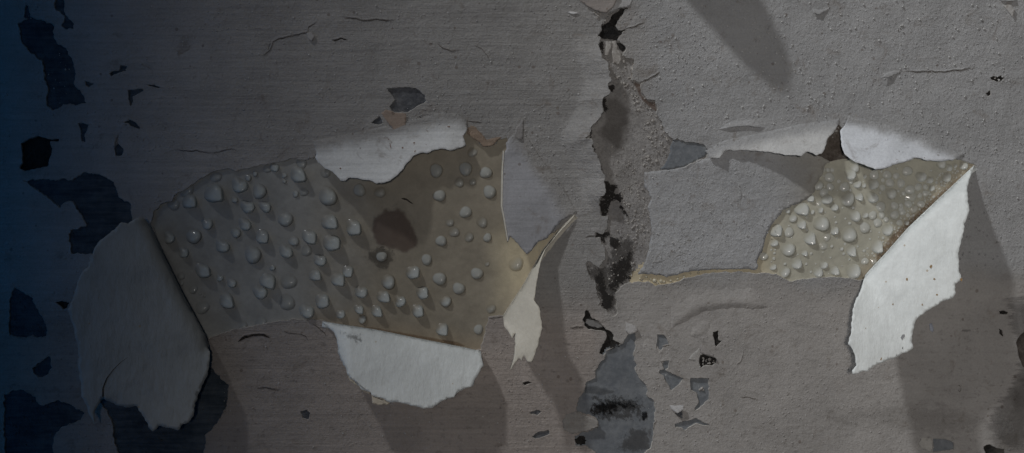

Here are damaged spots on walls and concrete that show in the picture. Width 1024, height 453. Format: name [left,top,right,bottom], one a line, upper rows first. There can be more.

peeling [18,0,94,110]
peeling [3,136,229,453]
peeling [313,87,467,184]
peeling [322,322,484,409]
peeling [501,131,578,369]
peeling [562,322,655,453]
crack [570,8,707,355]
peeling [657,331,721,430]
peeling [638,116,964,277]
peeling [848,166,977,374]